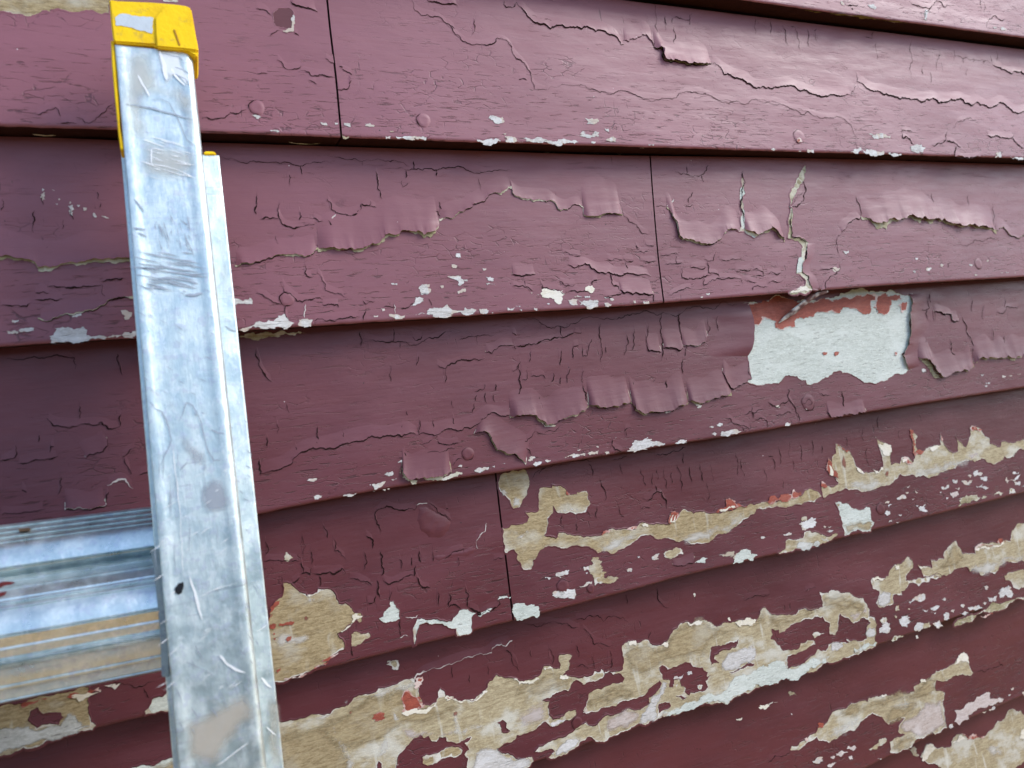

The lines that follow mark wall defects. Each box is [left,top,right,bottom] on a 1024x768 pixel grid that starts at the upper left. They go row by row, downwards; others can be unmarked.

crack [412,0,857,147]
crack [792,181,807,208]
peeling [7,285,136,344]
peeling [259,243,1024,599]
peeling [268,522,1024,768]